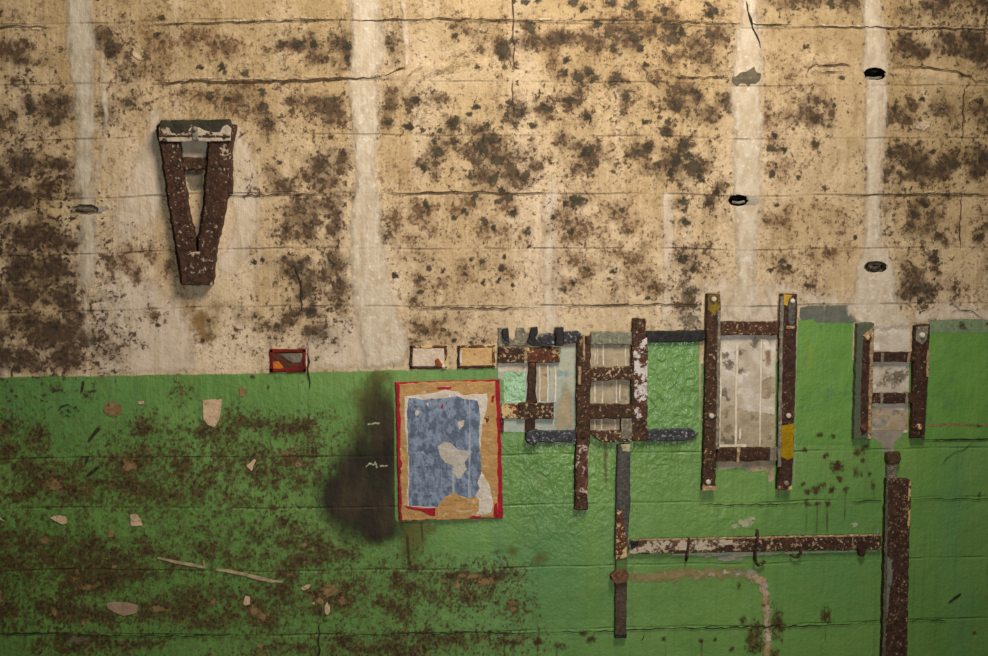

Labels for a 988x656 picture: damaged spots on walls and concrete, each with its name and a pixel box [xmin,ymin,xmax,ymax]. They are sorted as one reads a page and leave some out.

leakage [881,0,988,79]
leakage [374,0,865,358]
leakage [854,85,988,321]
peeling [0,376,553,656]
leakage [537,364,550,401]
leakage [556,389,573,429]
leakage [722,337,758,374]
corrosion [801,339,875,521]